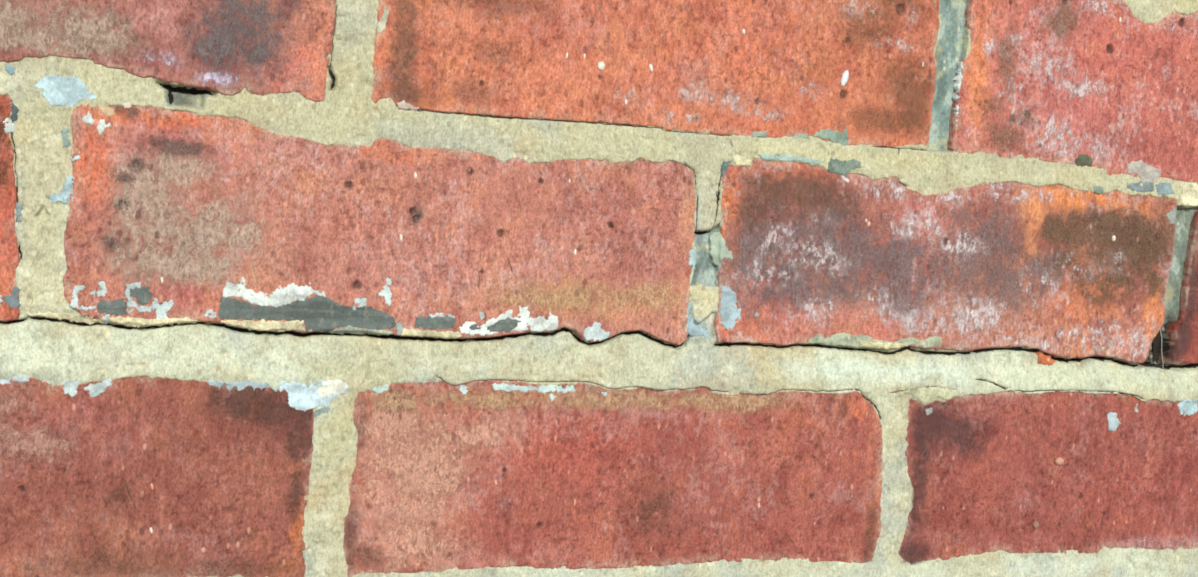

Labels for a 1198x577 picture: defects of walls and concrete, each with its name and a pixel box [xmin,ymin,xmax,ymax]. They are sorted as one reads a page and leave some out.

peeling [688,230,733,270]
damp [729,171,1175,357]
peeling [0,277,559,339]
peeling [584,322,611,342]
peeling [686,285,759,340]
crack [0,317,1198,419]